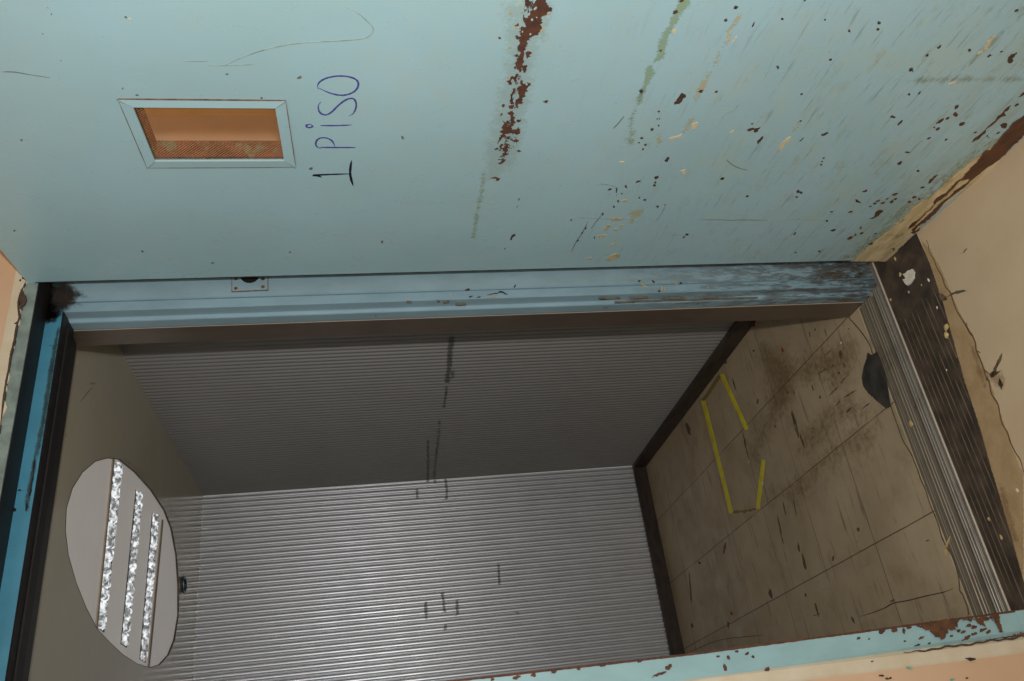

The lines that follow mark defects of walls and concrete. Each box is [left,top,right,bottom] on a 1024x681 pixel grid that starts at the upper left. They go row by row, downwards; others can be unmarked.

rust [495,0,552,164]
water stain [638,0,689,101]
peeling [968,36,1017,63]
peeling [847,92,1024,262]
peeling [577,180,666,261]
peeling [437,283,516,306]
peeling [598,279,758,308]
peeling [812,317,991,641]
peeling [857,626,931,646]